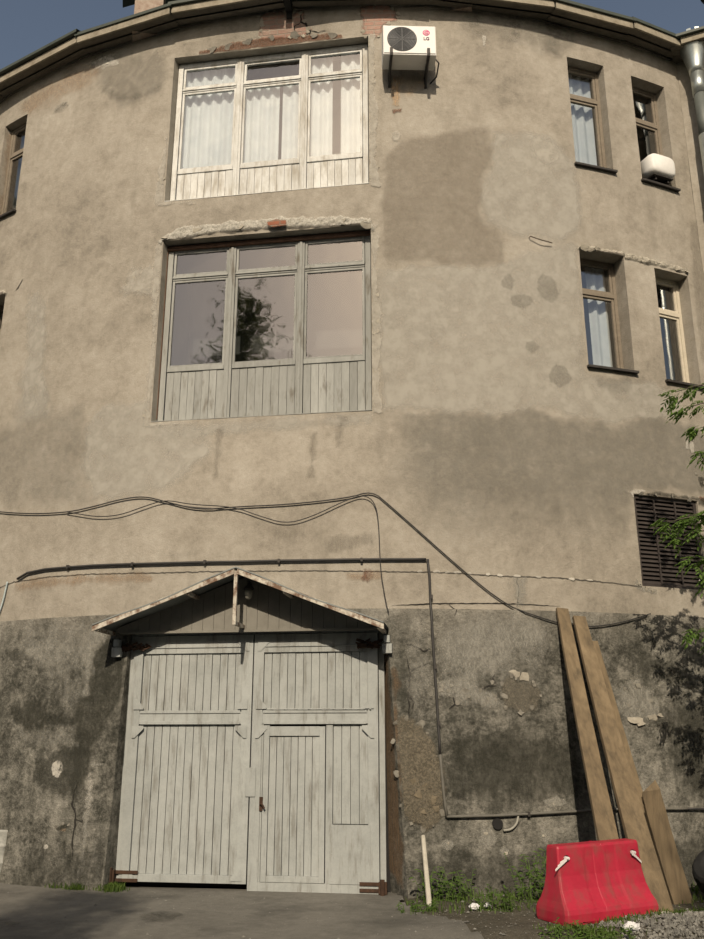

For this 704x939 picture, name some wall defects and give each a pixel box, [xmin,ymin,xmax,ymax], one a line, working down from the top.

flaking render [242,8,318,46]
flaking render [267,219,286,227]
damp [12,627,131,799]
spalling [438,670,542,716]
crack [71,782,83,857]